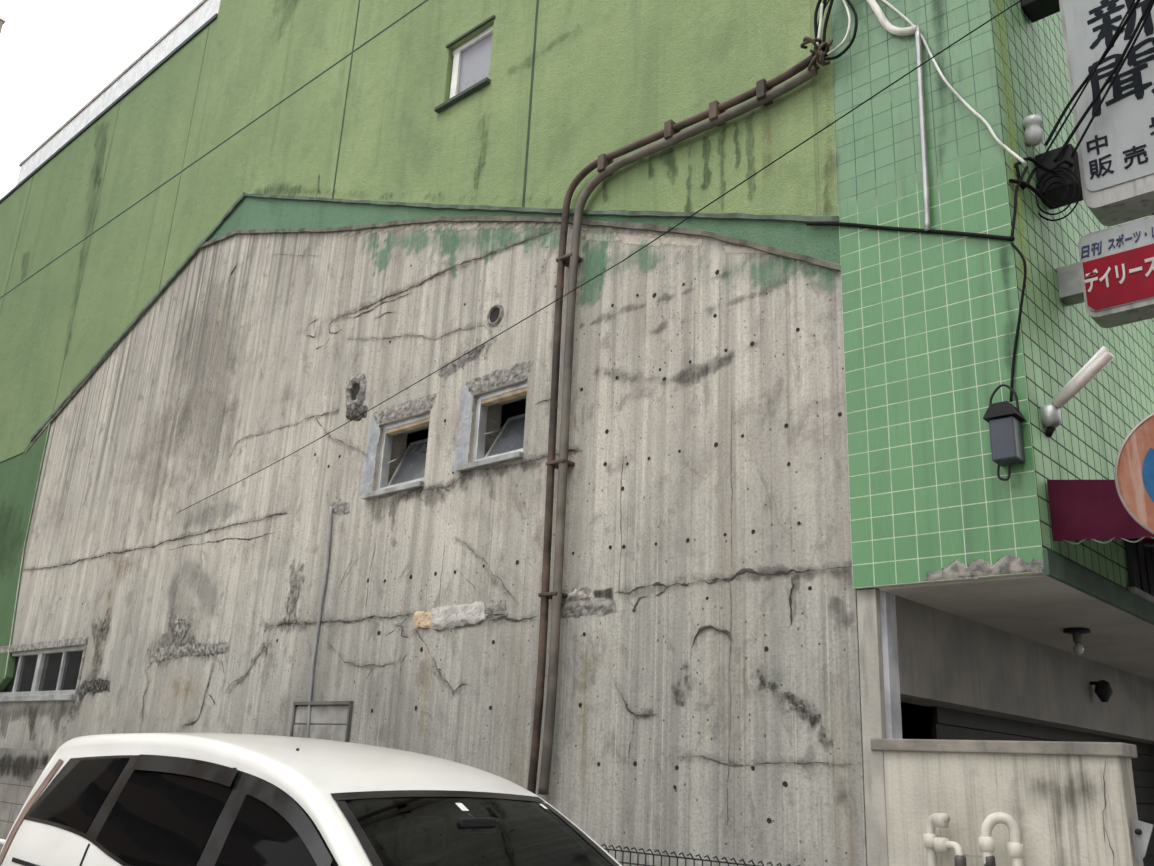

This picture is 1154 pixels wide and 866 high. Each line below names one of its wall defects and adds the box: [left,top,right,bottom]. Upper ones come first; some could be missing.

peeling [341,221,554,236]
peeling [581,230,703,248]
spalling [345,373,380,496]
crack [26,512,287,570]
spalling [924,554,1044,581]
crack [181,538,536,727]
peeling [413,600,508,630]
spalling [561,586,617,619]
crack [614,407,850,825]